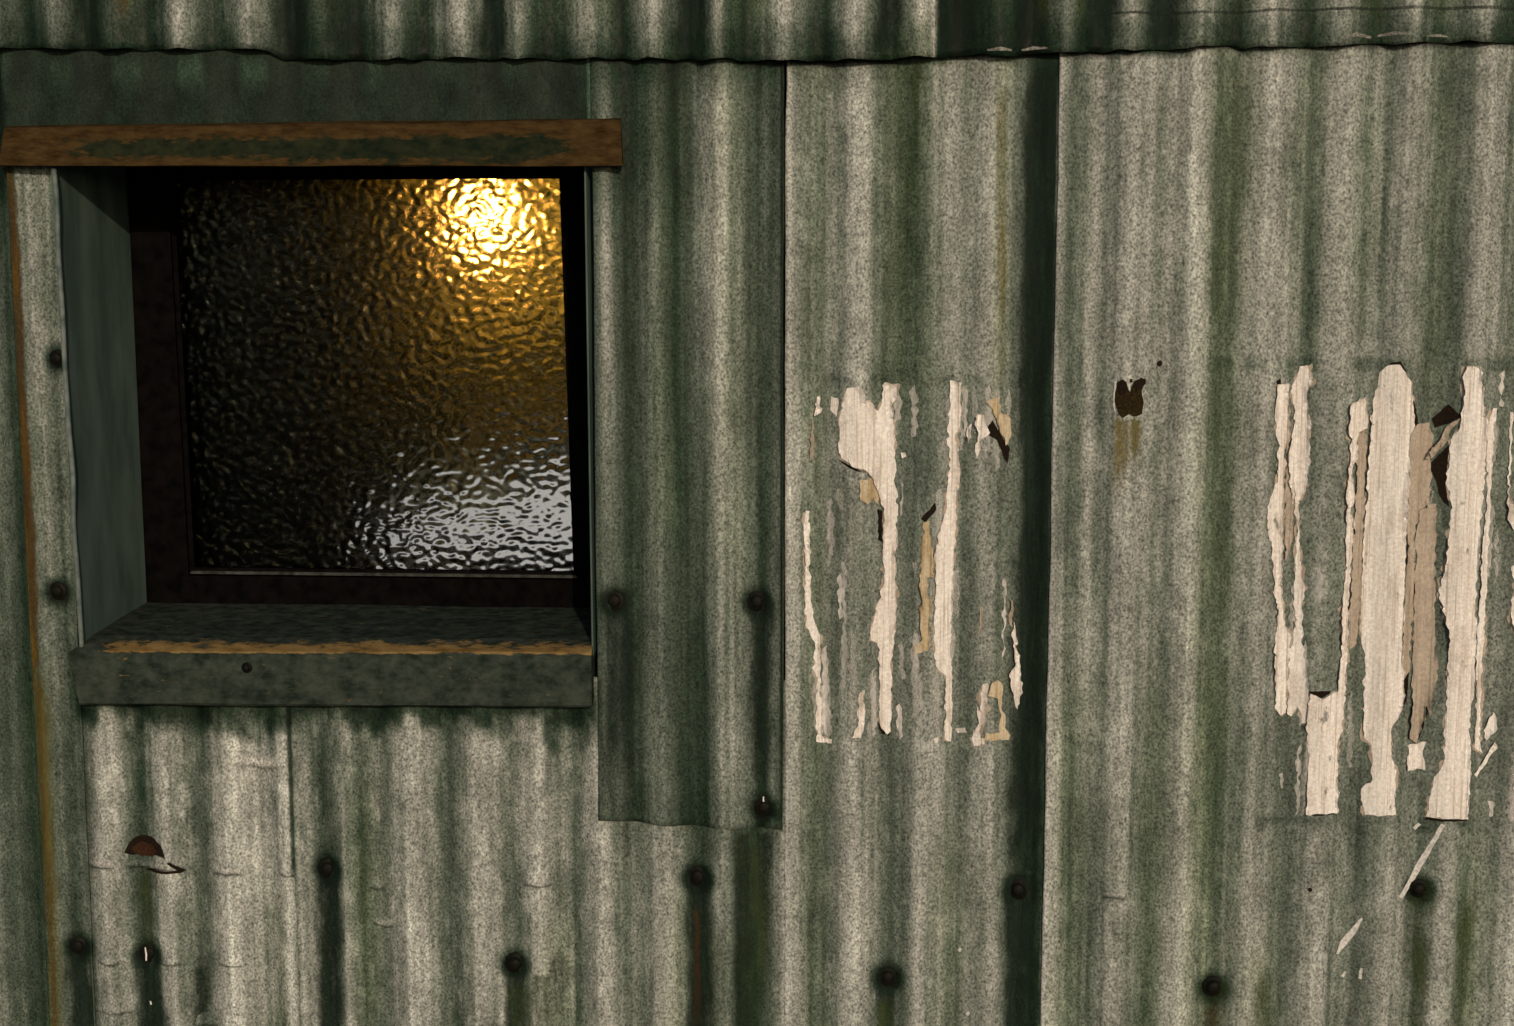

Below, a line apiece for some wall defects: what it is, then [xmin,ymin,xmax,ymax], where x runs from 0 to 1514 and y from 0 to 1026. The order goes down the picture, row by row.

corrosion [7,167,57,1025]
corrosion [1114,378,1144,474]